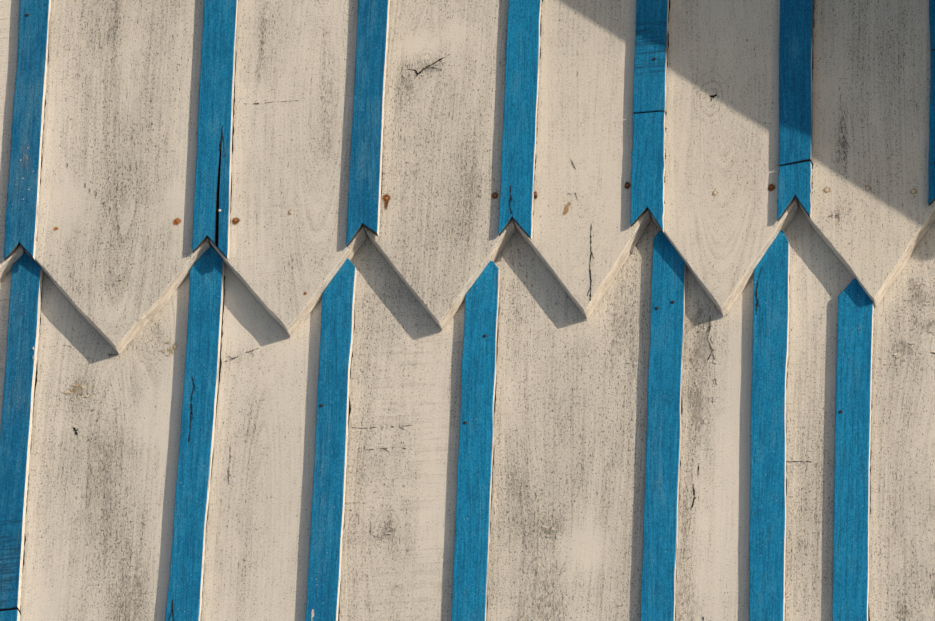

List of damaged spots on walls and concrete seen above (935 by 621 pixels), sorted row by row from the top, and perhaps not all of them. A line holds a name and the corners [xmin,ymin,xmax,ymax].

crack [408,54,450,79]